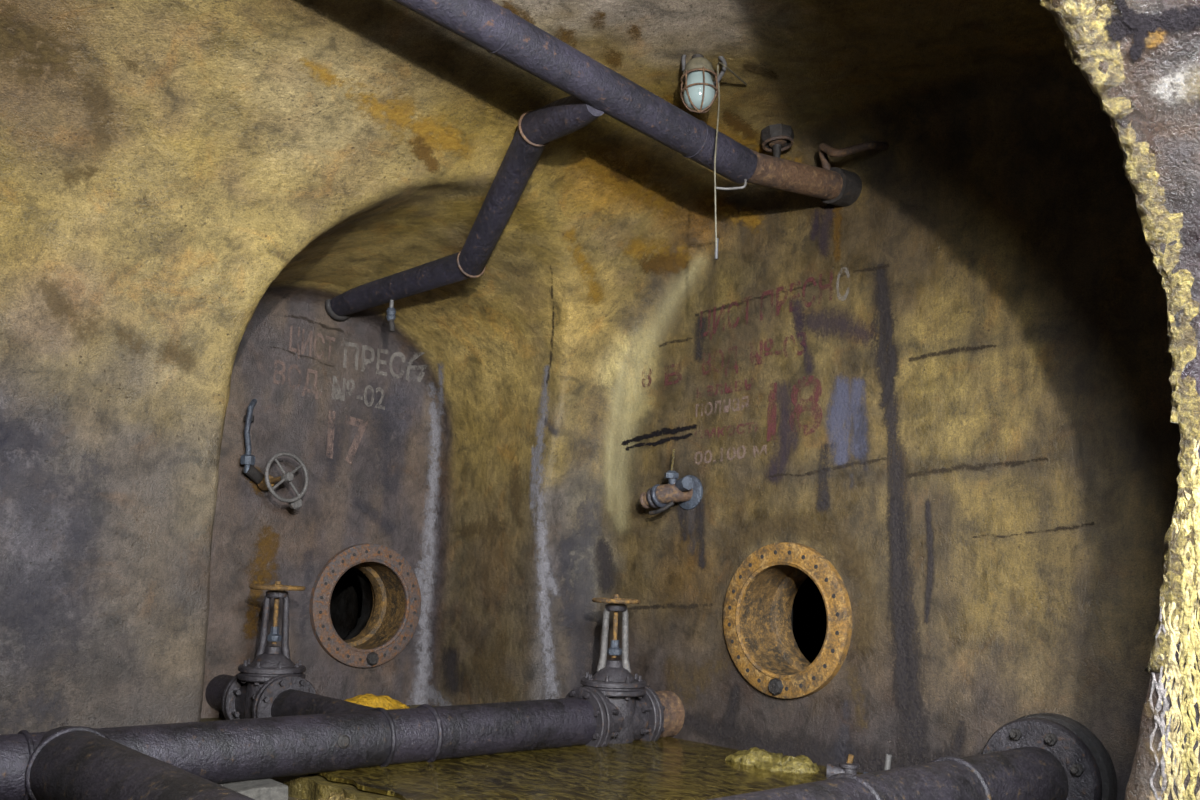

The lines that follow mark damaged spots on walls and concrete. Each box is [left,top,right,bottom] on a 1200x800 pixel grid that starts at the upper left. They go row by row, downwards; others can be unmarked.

corrosion [244,527,279,639]
damp [411,363,459,706]
damp [512,366,558,699]
damp [670,264,966,773]
damp [1039,0,1200,800]